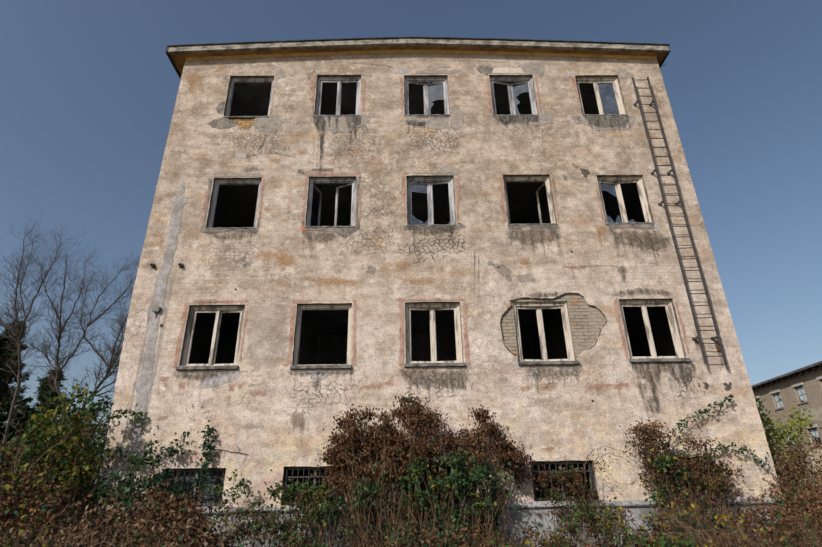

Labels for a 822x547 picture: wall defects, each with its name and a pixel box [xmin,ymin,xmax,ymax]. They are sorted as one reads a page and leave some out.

flaking render [228,118,255,129]
leakage [313,116,361,158]
crack [405,127,465,151]
crack [332,174,466,263]
leakage [507,229,559,244]
flaking render [500,292,628,370]
crack [289,374,363,414]
leakage [401,369,463,388]
leakage [632,360,694,412]